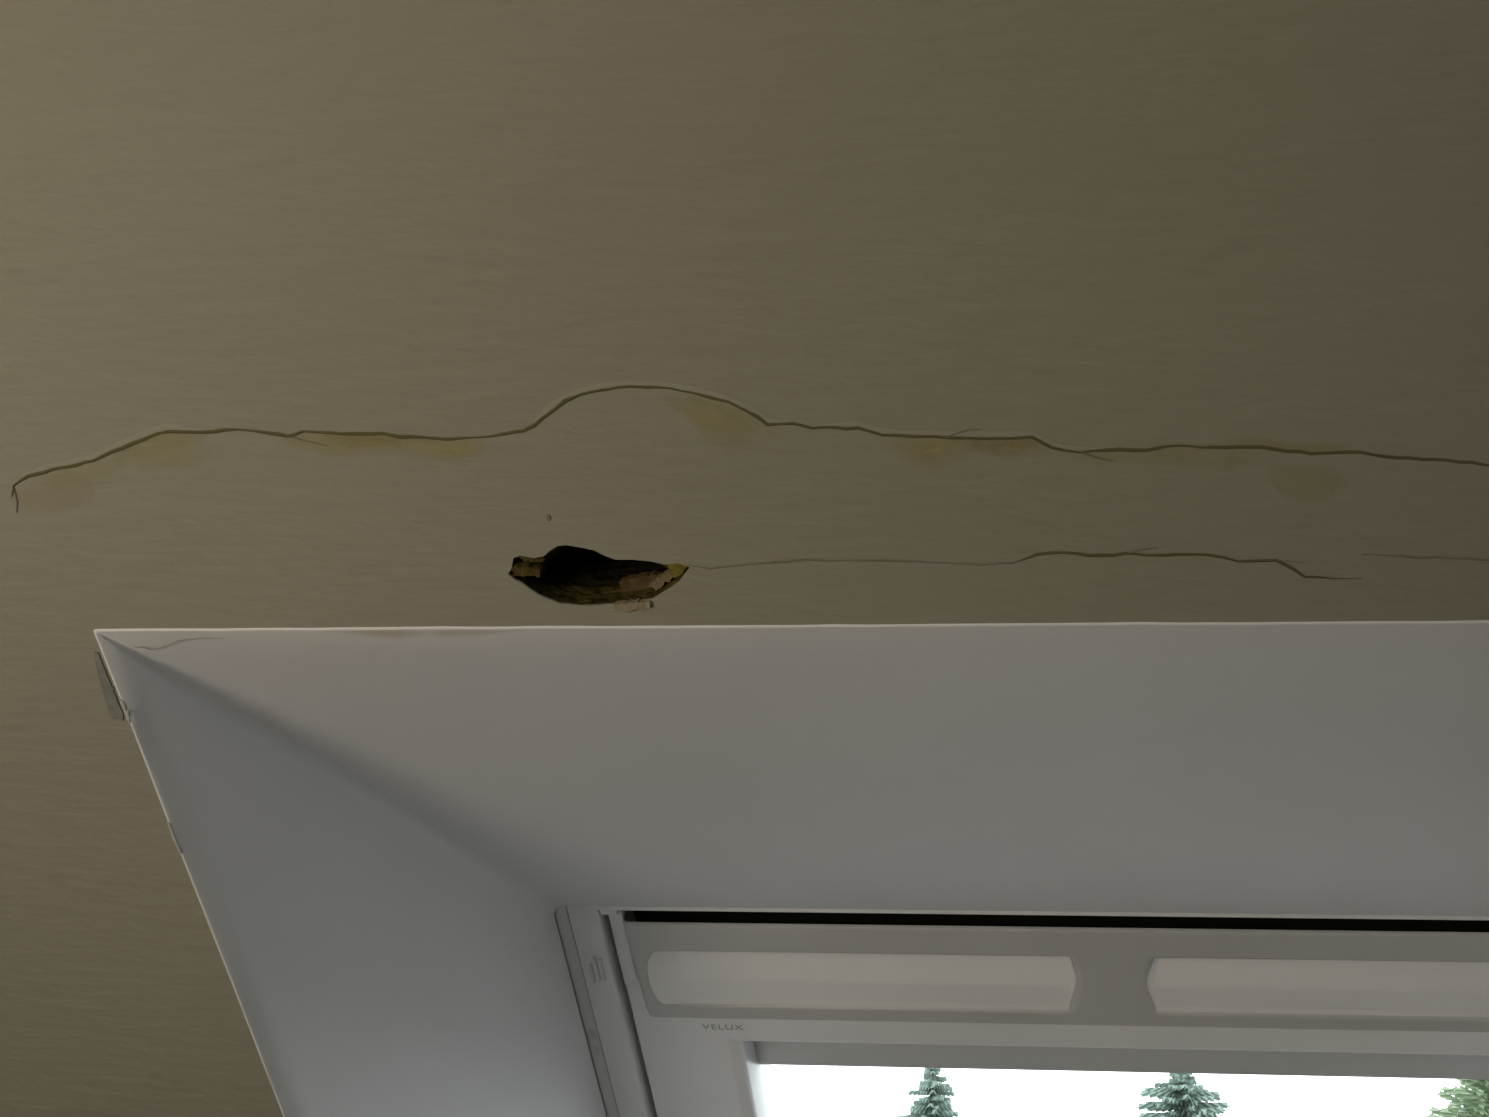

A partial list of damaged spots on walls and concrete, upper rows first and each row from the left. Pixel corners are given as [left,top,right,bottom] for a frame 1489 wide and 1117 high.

crack [11,381,1489,513]
spalling [511,545,687,613]
crack [686,548,1489,579]